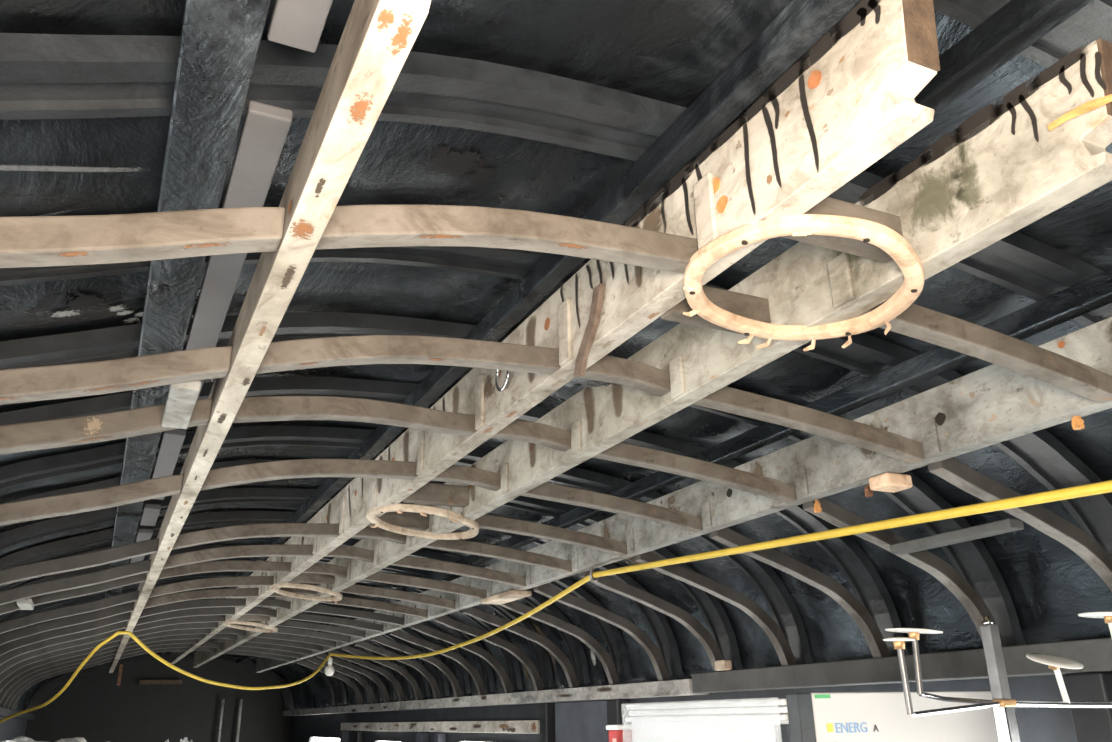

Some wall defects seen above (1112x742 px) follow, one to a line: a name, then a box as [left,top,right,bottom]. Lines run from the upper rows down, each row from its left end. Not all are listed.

rust [377,9,416,56]
rust [347,92,373,125]
damp [860,46,1106,226]
rust [287,197,314,240]